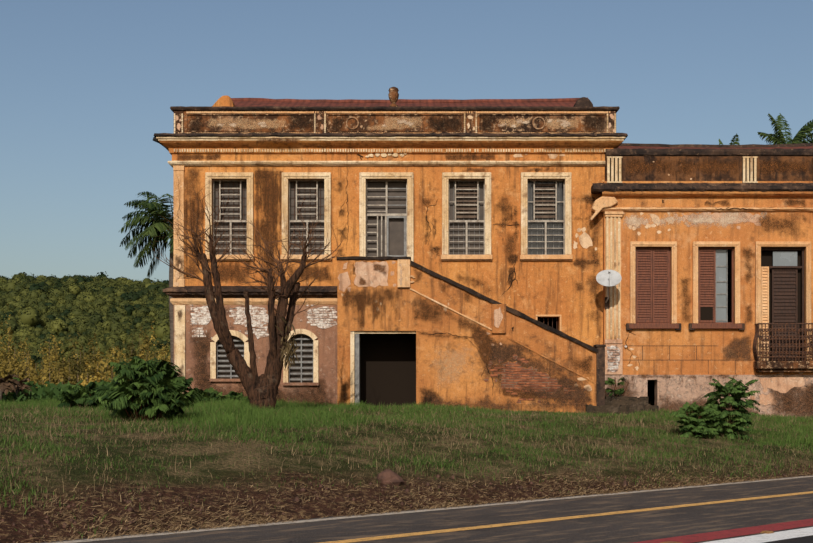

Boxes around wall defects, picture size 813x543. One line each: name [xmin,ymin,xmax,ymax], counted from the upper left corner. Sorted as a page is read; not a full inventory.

damp [259,116,309,142]
damp [428,117,461,131]
crack [339,154,363,251]
flaking render [573,227,597,250]
flaking render [623,212,767,235]
flaking render [338,261,396,296]
flaking render [189,305,213,341]
flaking render [229,305,269,340]
flaking render [300,305,337,330]
flaking render [486,307,504,335]
flaking render [484,355,592,403]
damp [771,385,813,417]